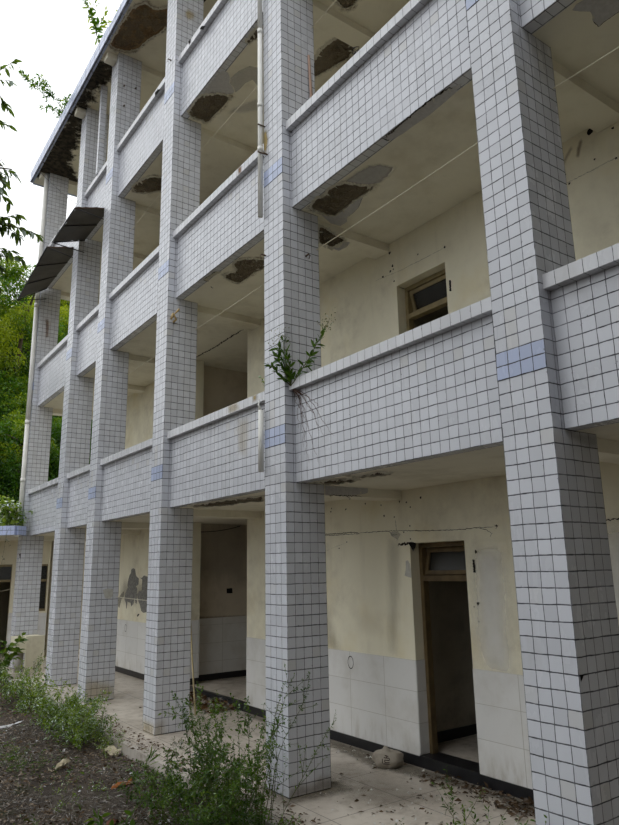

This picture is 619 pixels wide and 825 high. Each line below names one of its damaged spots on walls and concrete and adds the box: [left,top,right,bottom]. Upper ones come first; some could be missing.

spalling [334,0,358,10]
spalling [109,1,168,53]
spalling [314,37,356,78]
spalling [187,71,234,123]
spalling [131,175,162,195]
spalling [309,181,377,251]
spalling [204,257,264,288]
crack [196,330,242,358]
peeling [312,471,394,497]
spalling [187,496,265,508]
crack [325,520,498,546]
peeling [125,568,148,617]